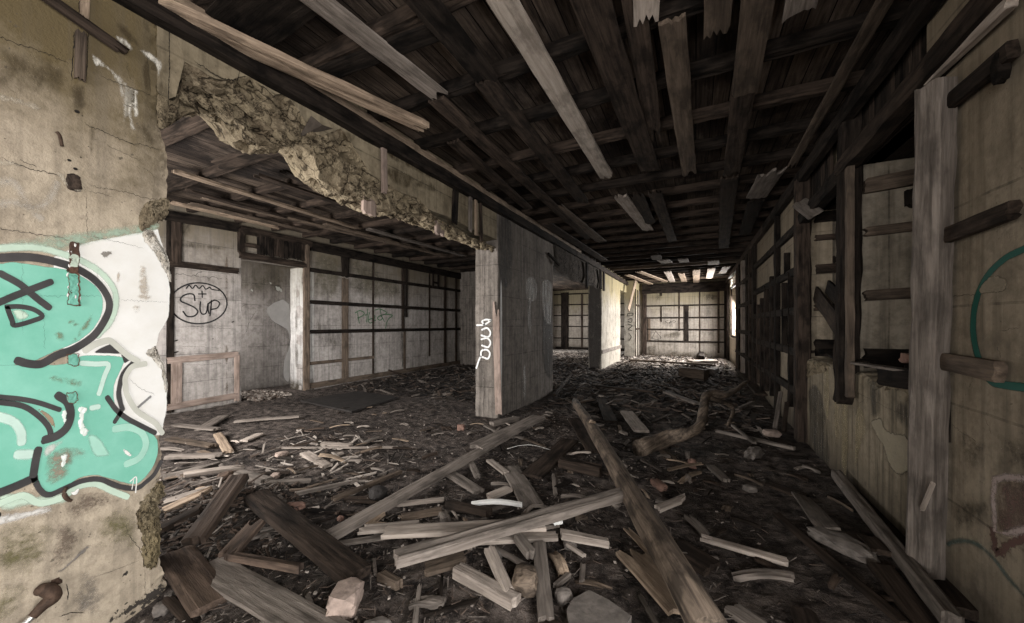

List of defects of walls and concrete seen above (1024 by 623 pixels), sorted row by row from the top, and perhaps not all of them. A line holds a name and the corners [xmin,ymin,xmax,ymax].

spalling [159,62,496,253]
rust [66,241,81,306]